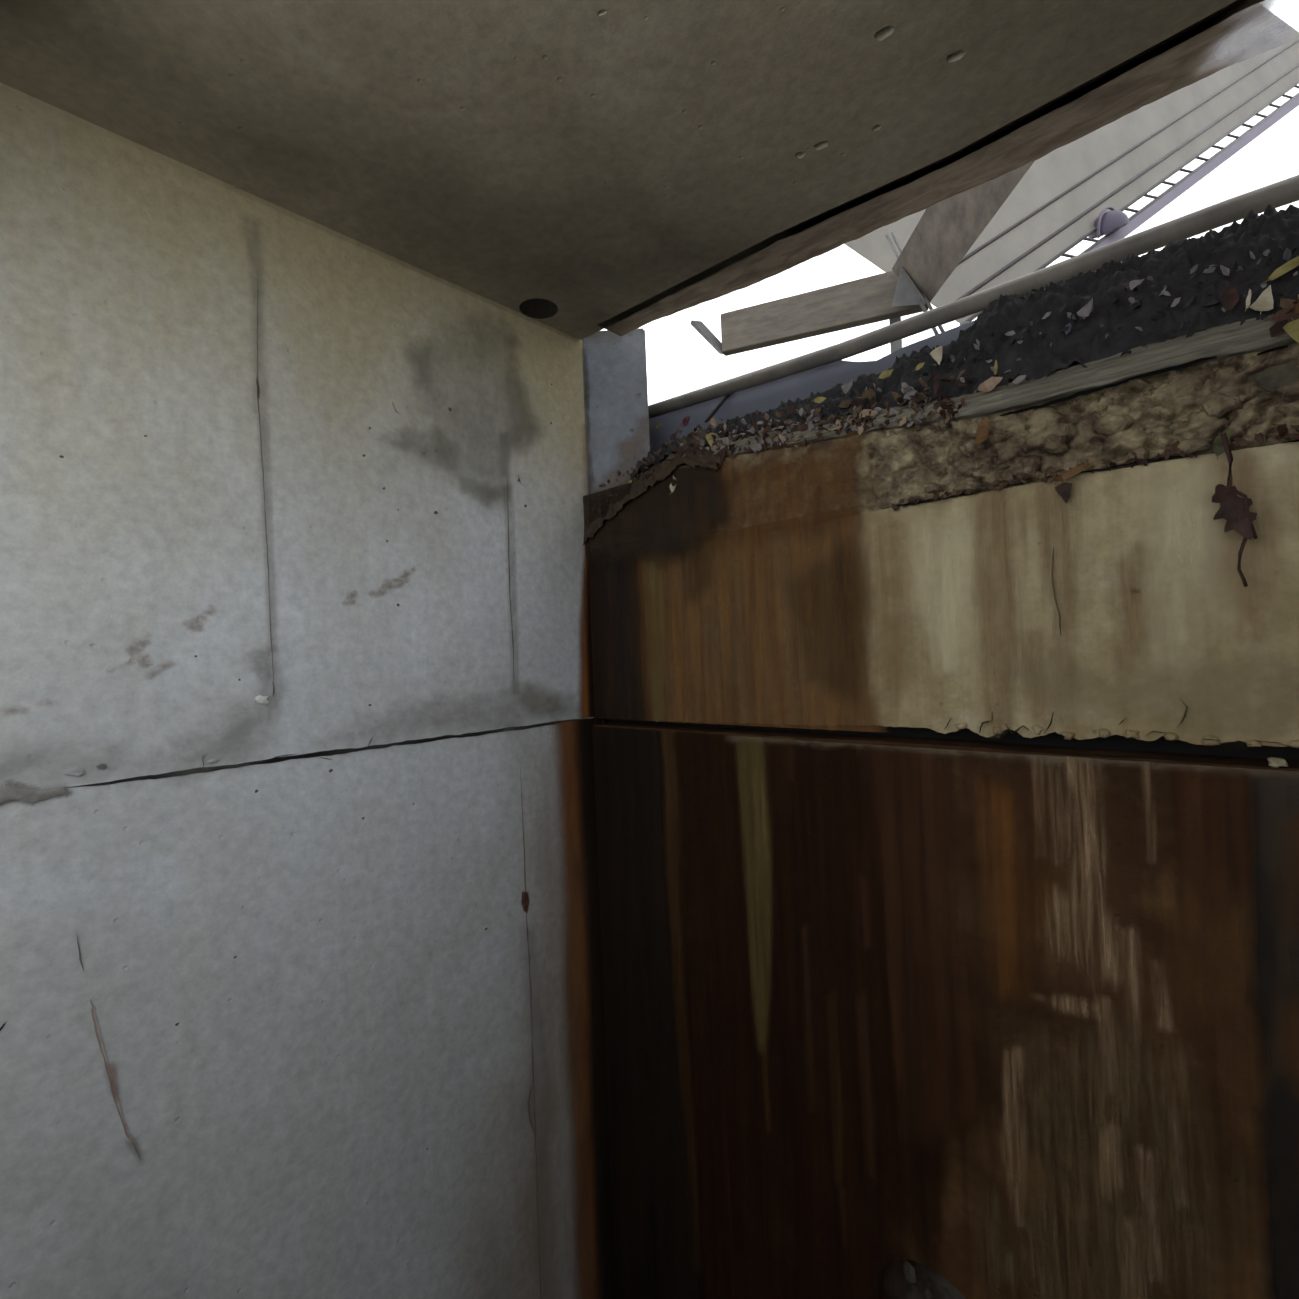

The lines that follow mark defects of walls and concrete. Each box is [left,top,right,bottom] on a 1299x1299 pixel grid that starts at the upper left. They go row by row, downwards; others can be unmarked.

spalling [675,343,1299,515]
crack [256,270,275,695]
corrosion [636,437,877,732]
crack [66,718,587,793]
spalling [945,711,1075,740]
spalling [1099,697,1188,741]
spalling [1201,734,1221,745]
spalling [1245,739,1299,768]
spalling [0,764,107,805]